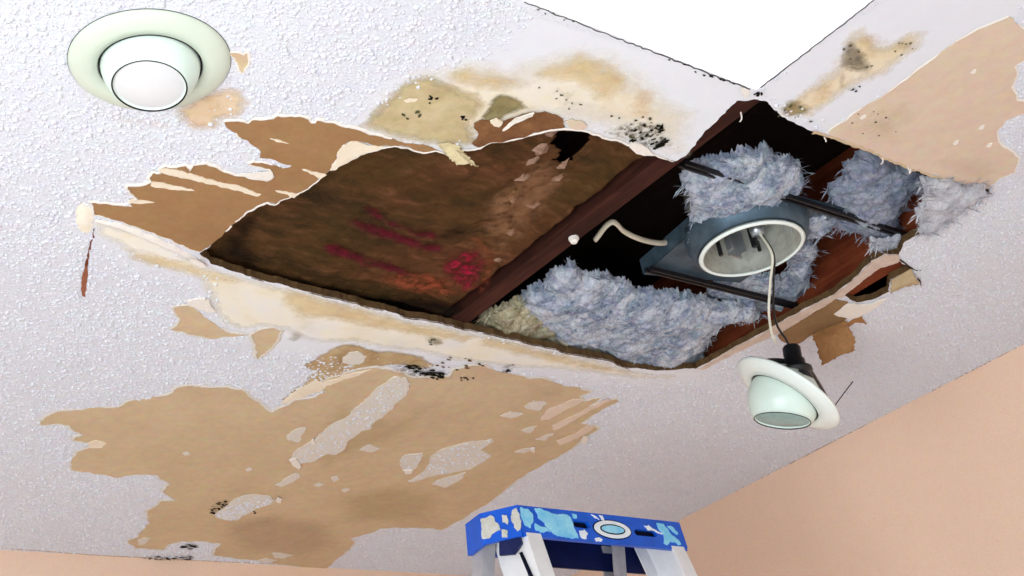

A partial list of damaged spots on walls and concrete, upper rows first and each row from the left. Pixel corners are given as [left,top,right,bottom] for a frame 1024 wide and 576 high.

peeling [87,113,437,268]
water stain [367,58,680,150]
peeling [472,111,587,147]
peeling [629,142,655,156]
water stain [784,35,915,122]
peeling [826,15,1024,189]
peeling [168,297,286,359]
water stain [326,245,460,318]
water stain [445,253,480,288]
spalling [698,253,900,370]
water stain [282,345,484,404]
peeling [38,363,618,568]